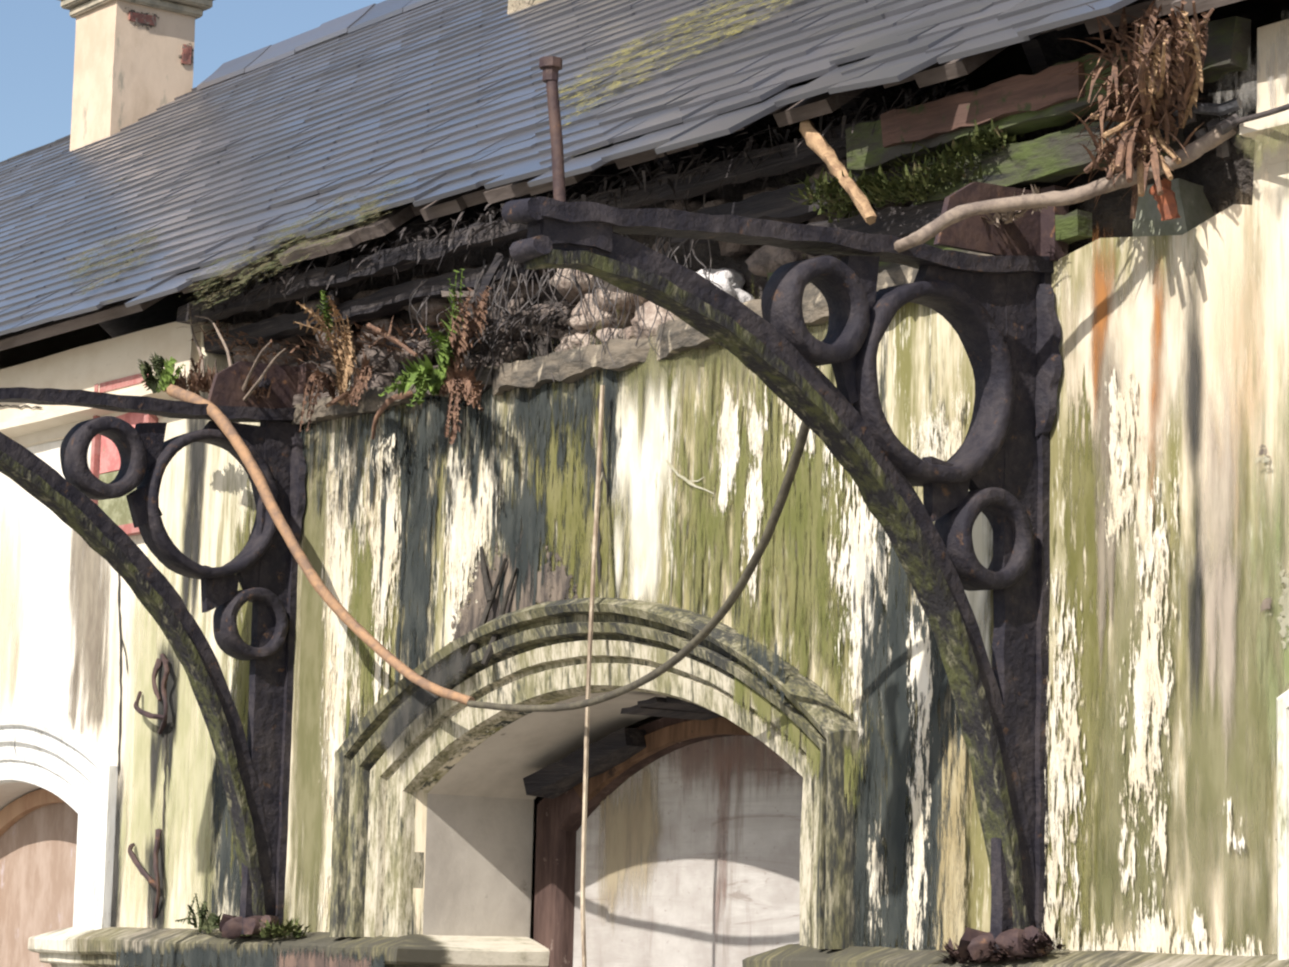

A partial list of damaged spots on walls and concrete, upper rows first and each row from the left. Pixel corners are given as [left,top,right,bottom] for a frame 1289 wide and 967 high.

flaking render [125,8,159,30]
flaking render [179,43,194,65]
corrosion [1092,255,1111,402]
corrosion [1151,277,1162,448]
leakage [70,530,109,732]
peeling [318,416,403,931]
leakage [300,344,742,752]
peeling [611,368,679,602]
leakage [663,522,973,951]
leakage [1046,751,1207,950]
leakage [1066,260,1236,734]
peeling [1042,367,1263,956]